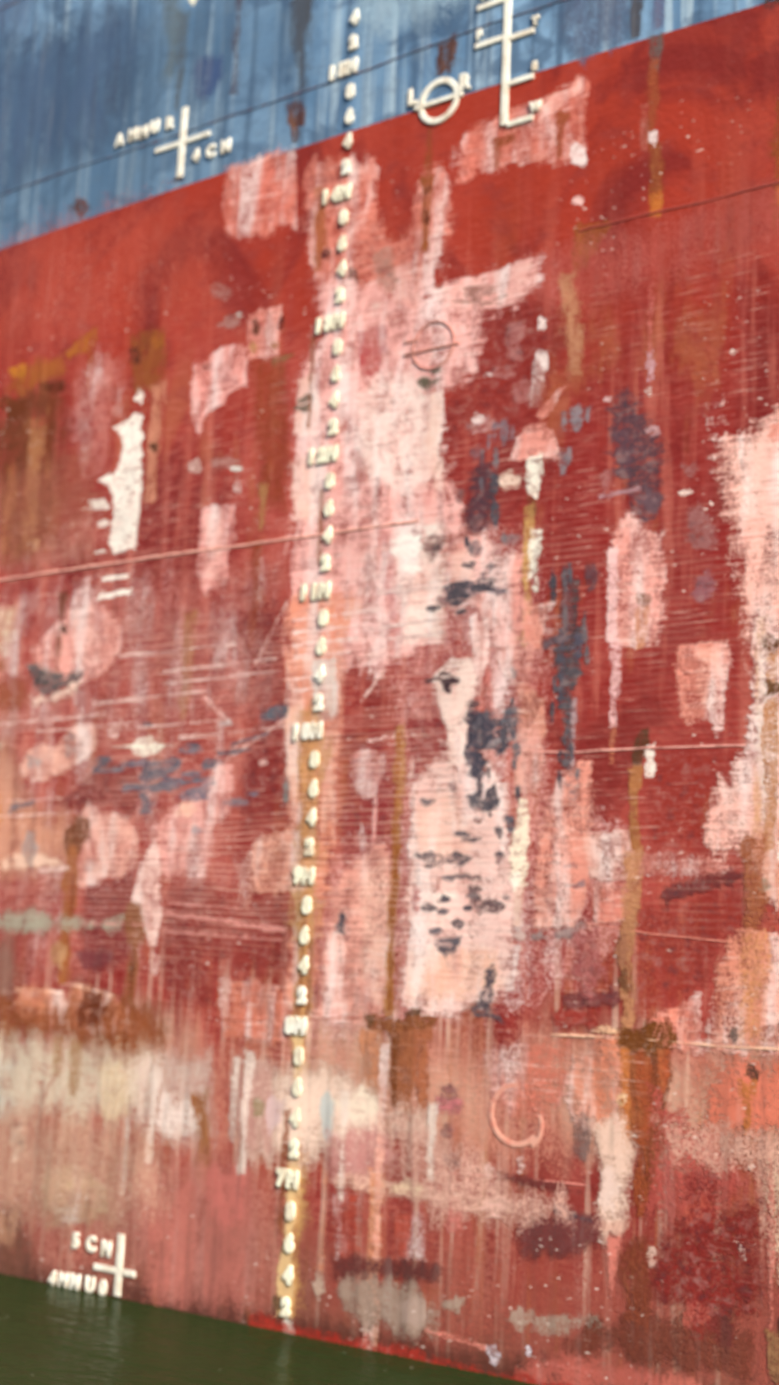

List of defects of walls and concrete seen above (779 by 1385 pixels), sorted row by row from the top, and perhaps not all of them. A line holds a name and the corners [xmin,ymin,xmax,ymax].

rust [639,31,665,219]
rust [127,323,169,505]
peeling [189,282,285,437]
peeling [216,73,779,1351]
peeling [13,982,131,1039]
rust [358,723,440,1115]
rust [607,728,684,1333]